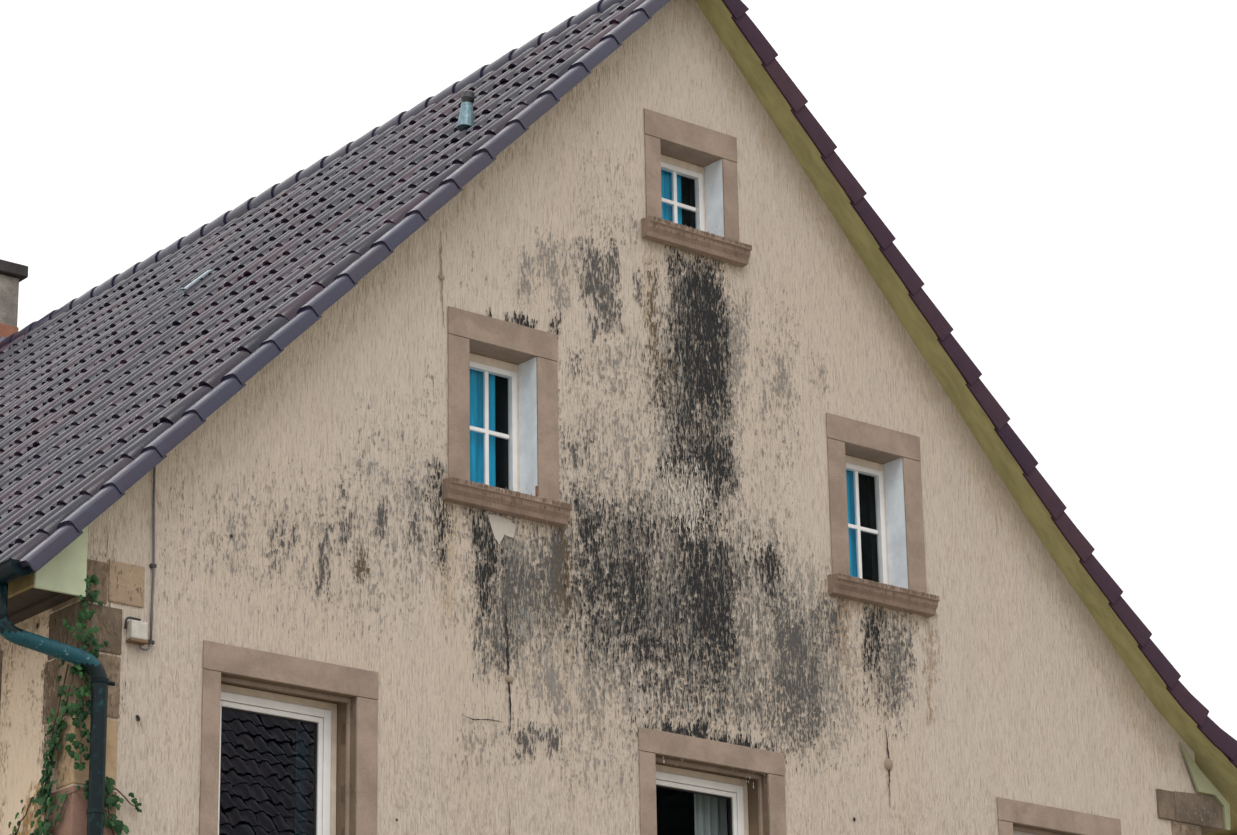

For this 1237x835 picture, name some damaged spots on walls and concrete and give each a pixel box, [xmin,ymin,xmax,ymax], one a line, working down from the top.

damp [18,25,973,835]
damp [0,638,73,835]
crack [466,602,511,732]